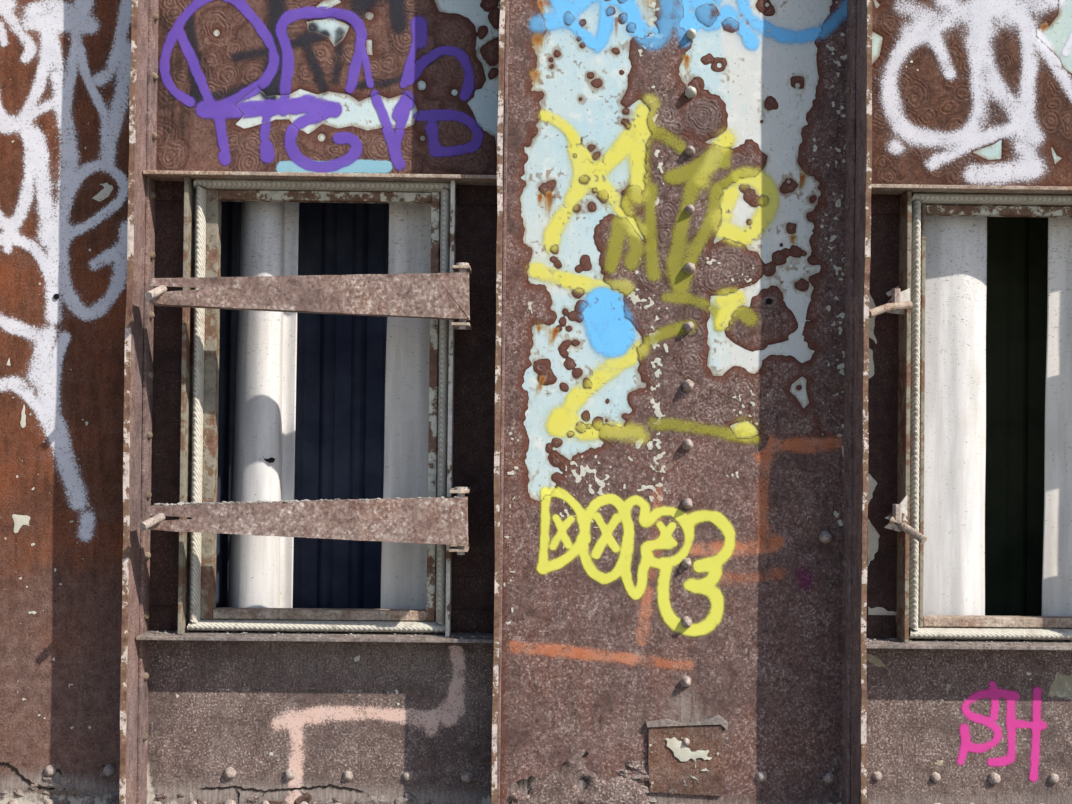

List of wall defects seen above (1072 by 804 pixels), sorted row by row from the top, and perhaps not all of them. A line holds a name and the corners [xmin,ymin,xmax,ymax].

peeling [871,0,1072,187]
peeling [156,0,847,804]
crack [0,762,66,791]
corrosion [42,791,70,804]
corrosion [87,791,119,804]
crack [200,784,369,803]